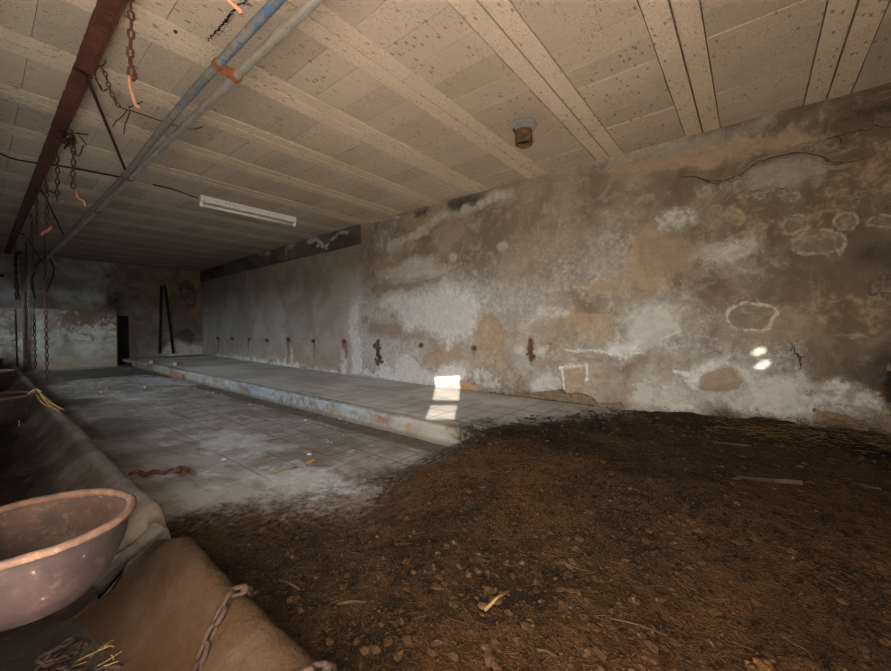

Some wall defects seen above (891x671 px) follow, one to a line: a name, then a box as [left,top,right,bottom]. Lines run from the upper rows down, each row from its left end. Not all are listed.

crack [678,120,890,194]
water stain [448,193,484,213]
water stain [640,207,697,293]
water stain [216,271,518,388]
water stain [559,327,643,389]
water stain [673,357,750,384]
water stain [730,306,813,342]
water stain [811,361,891,412]